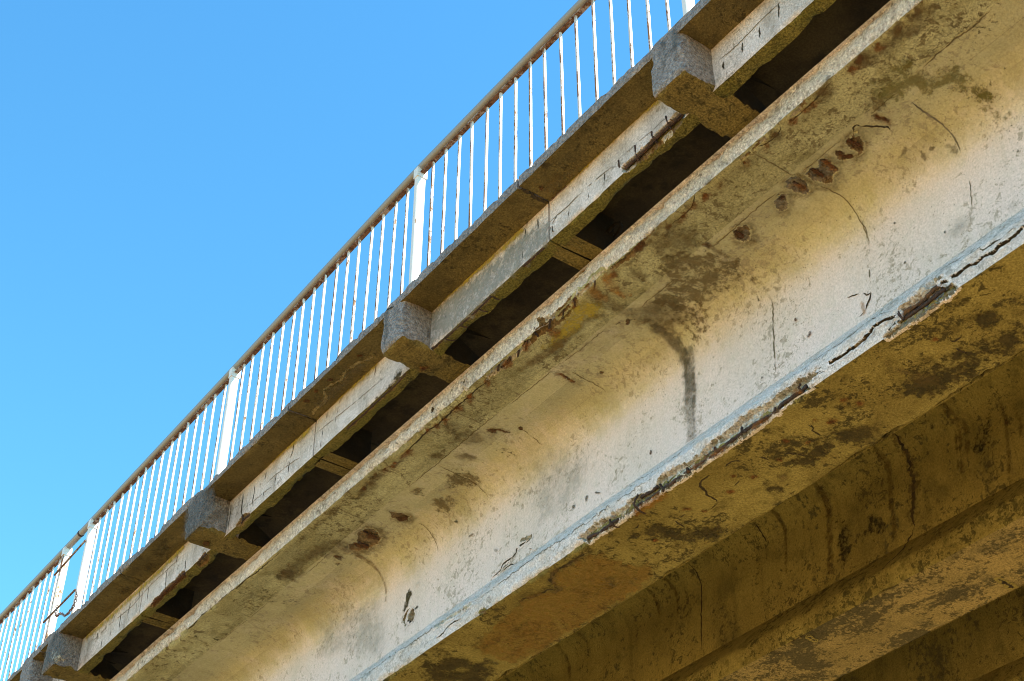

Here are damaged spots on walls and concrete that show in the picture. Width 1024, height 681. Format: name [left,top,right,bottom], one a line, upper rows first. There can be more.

crack [923,12,989,68]
spalling [618,111,689,176]
spalling [729,223,755,244]
crack [712,85,960,380]
spalling [878,272,962,342]
crack [404,329,606,497]
spalling [576,362,829,546]
crack [883,435,916,568]